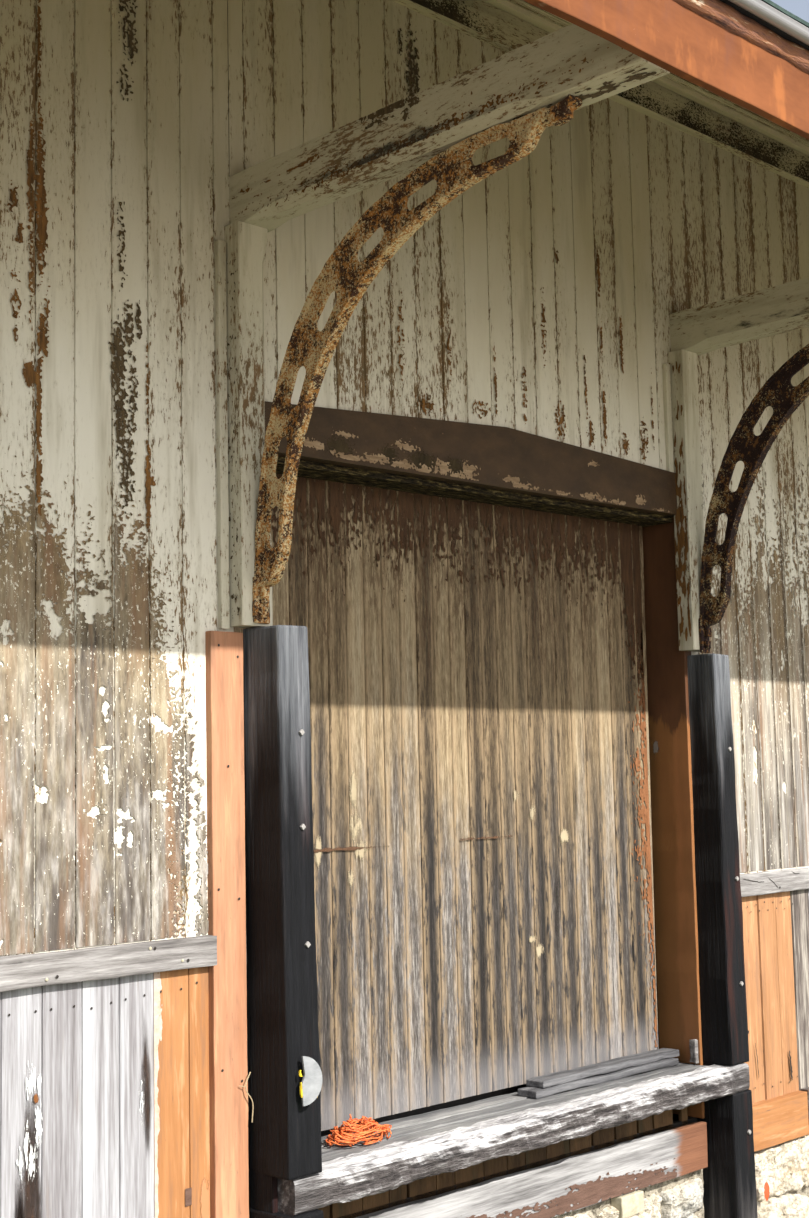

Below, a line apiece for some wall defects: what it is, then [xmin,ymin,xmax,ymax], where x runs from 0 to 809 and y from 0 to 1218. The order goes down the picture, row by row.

water stain [410,0,502,39]
peeling [238,24,657,215]
water stain [618,82,809,182]
peeling [0,0,209,955]
peeling [304,430,481,481]
peeling [397,291,442,416]
peeling [472,345,498,419]
peeling [583,349,607,467]
peeling [503,399,691,646]
peeling [622,372,655,464]
peeling [699,444,809,873]
peeling [467,1158,677,1218]